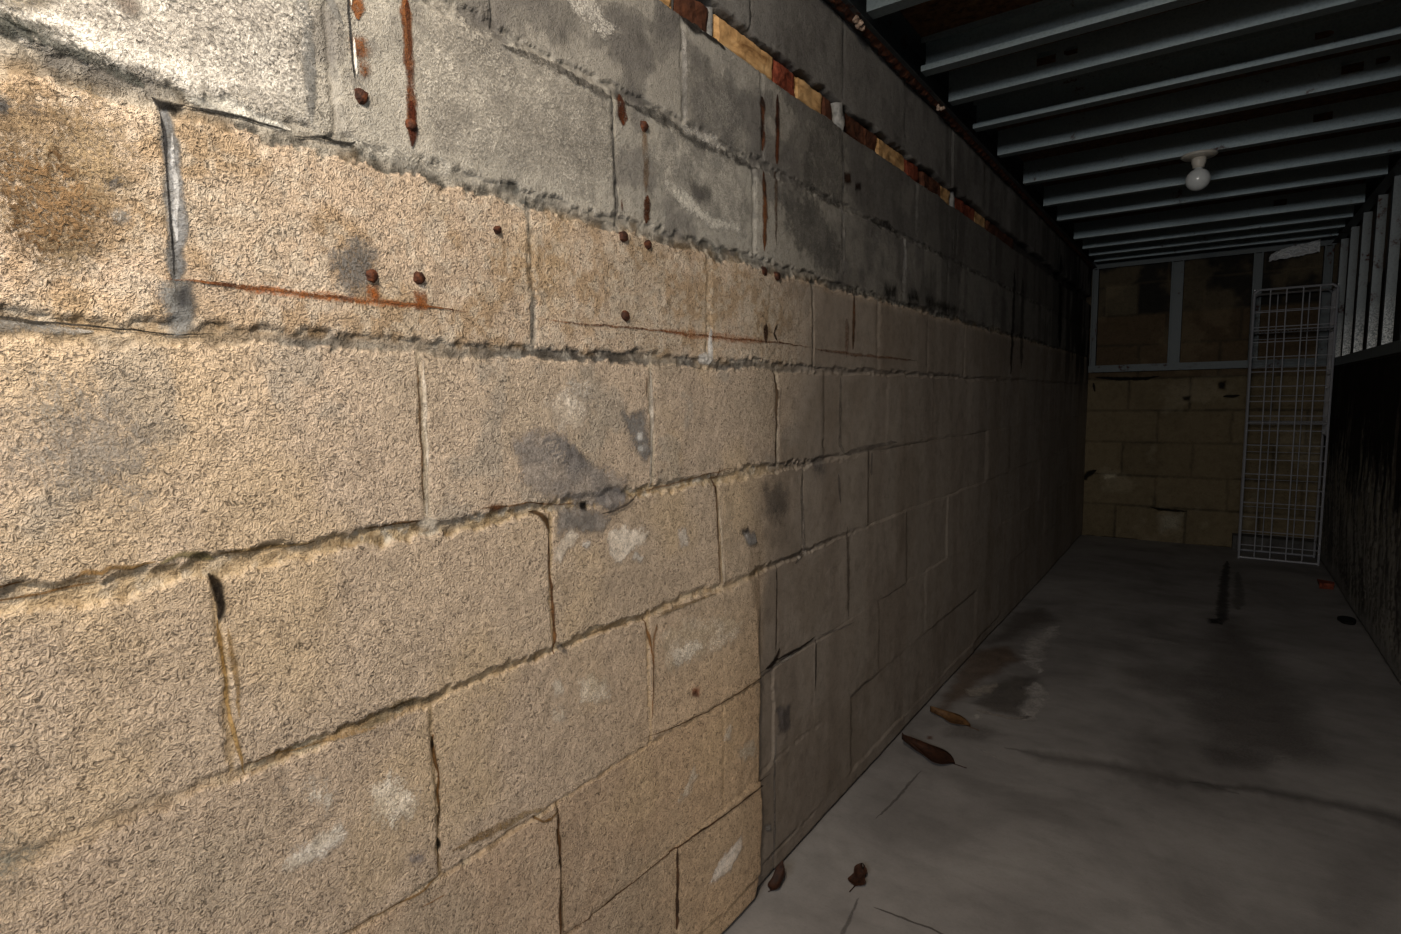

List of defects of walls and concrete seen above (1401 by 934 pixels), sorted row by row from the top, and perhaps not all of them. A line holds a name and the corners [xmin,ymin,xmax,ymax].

corrosion [350,0,365,20]
corrosion [352,37,368,76]
corrosion [400,0,418,147]
crack [0,0,359,284]
leakage [0,82,135,268]
corrosion [167,278,466,312]
crack [0,316,212,336]
leakage [544,379,592,433]
leakage [1323,355,1401,558]
crack [368,520,424,529]
crack [0,541,768,934]